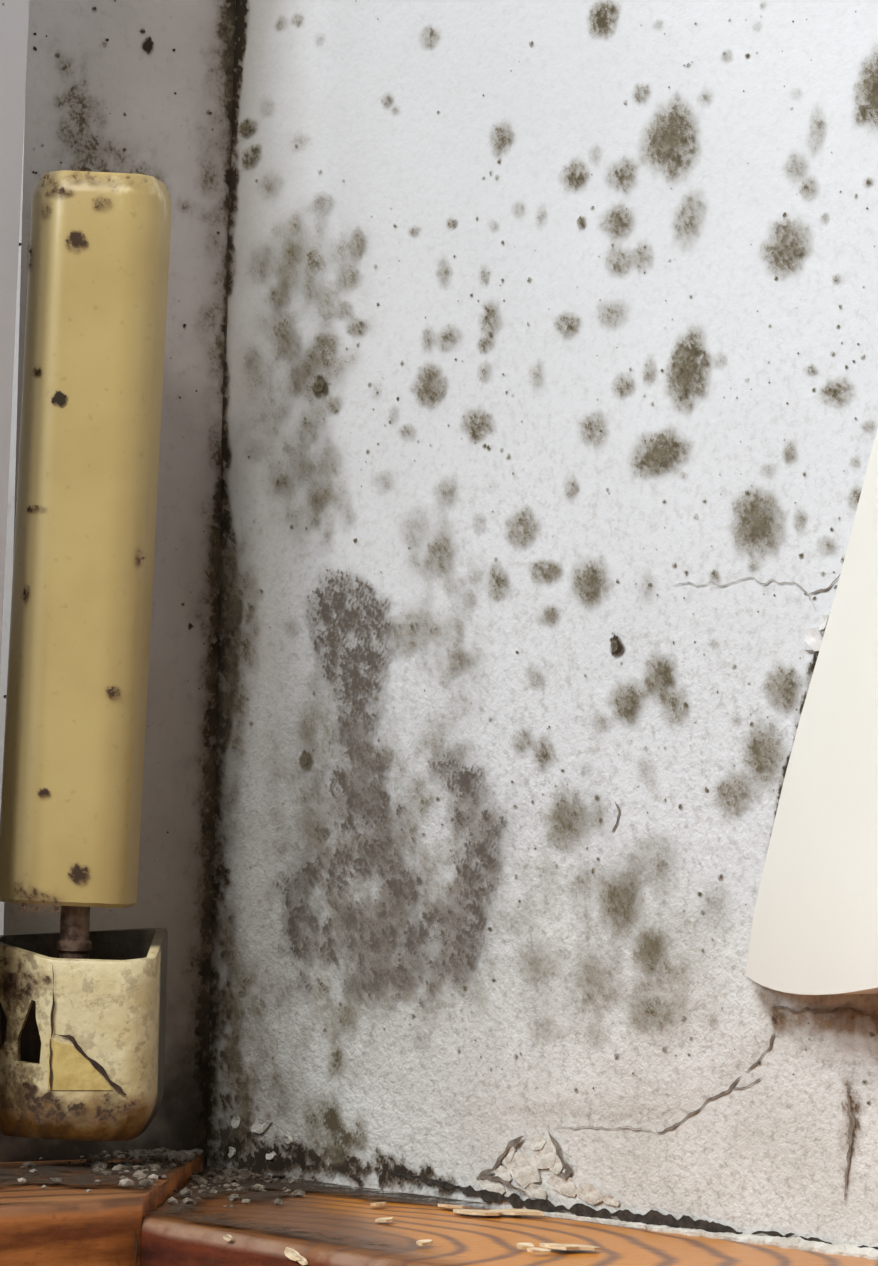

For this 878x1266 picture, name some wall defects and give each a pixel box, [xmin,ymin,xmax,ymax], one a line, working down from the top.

mould [589,2,617,35]
mould [856,53,878,124]
mould [643,105,696,189]
mould [751,212,808,281]
mould [615,332,709,409]
damp [812,325,865,404]
mould [631,431,689,478]
damp [181,0,517,1196]
crack [671,573,841,609]
damp [610,633,624,665]
mould [611,656,696,723]
mould [705,651,819,837]